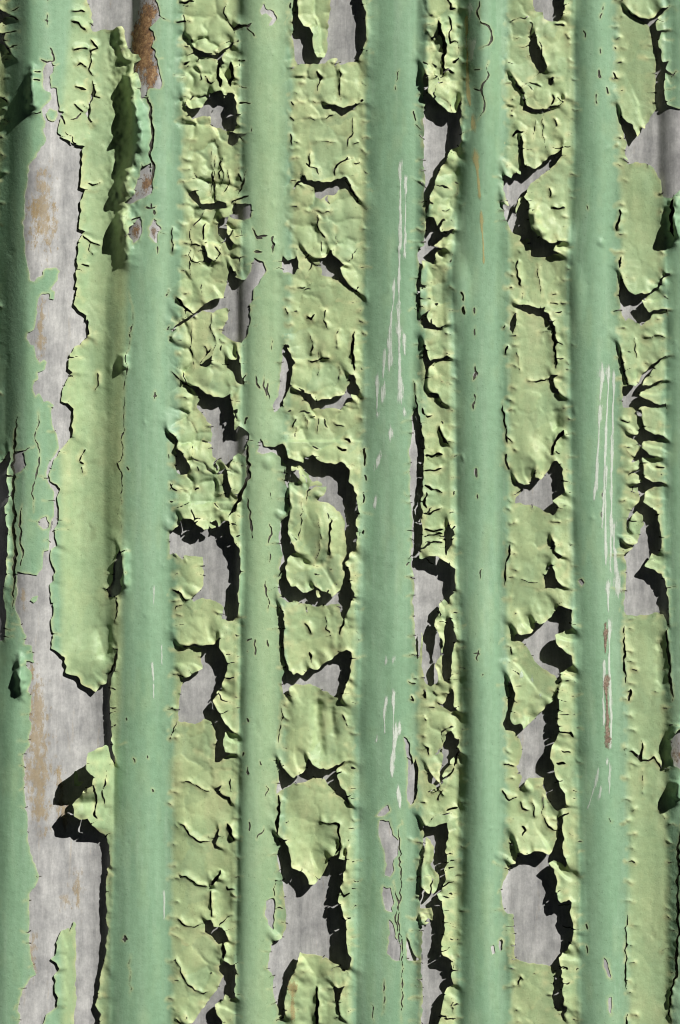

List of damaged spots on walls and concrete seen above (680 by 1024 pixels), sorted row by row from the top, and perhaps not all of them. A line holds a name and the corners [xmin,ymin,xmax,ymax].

rust [131,2,159,89]
peeling [256,0,379,127]
crack [290,102,360,175]
peeling [492,0,577,405]
peeling [606,0,680,236]
crack [285,287,355,379]
crack [11,416,40,613]
peeling [0,48,128,1024]
peeling [156,59,473,1024]
peeling [609,263,680,701]
peeling [487,448,588,1024]
rust [604,674,612,748]